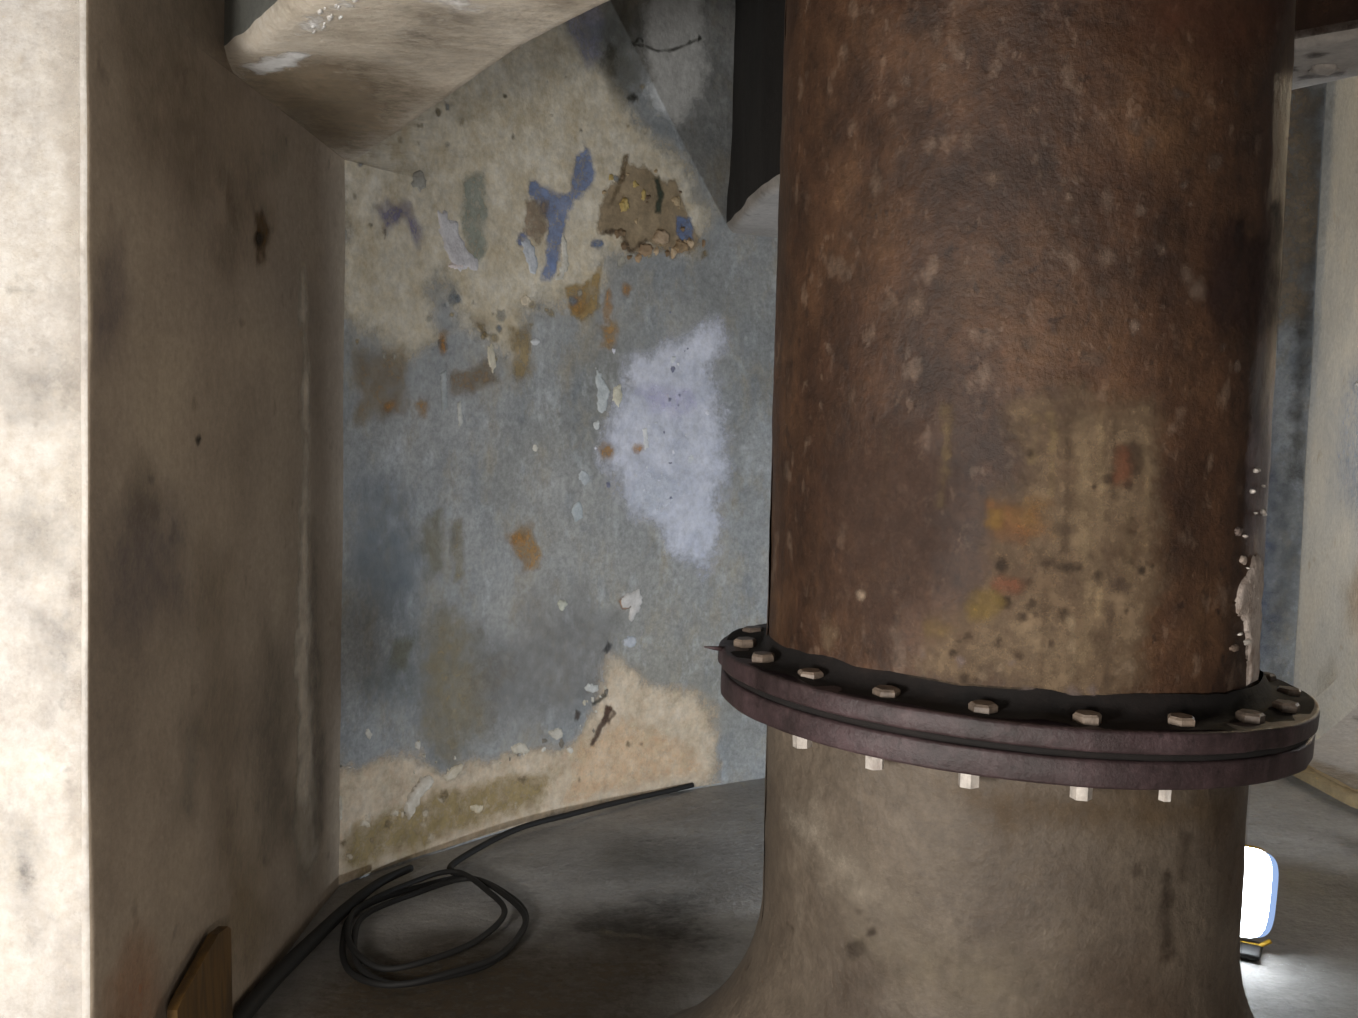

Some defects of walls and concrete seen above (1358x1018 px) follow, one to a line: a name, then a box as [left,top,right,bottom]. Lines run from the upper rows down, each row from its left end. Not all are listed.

peeling [344,18,710,430]
flaking render [339,588,718,885]
peeling [1229,553,1264,686]
peeling [1234,509,1267,538]